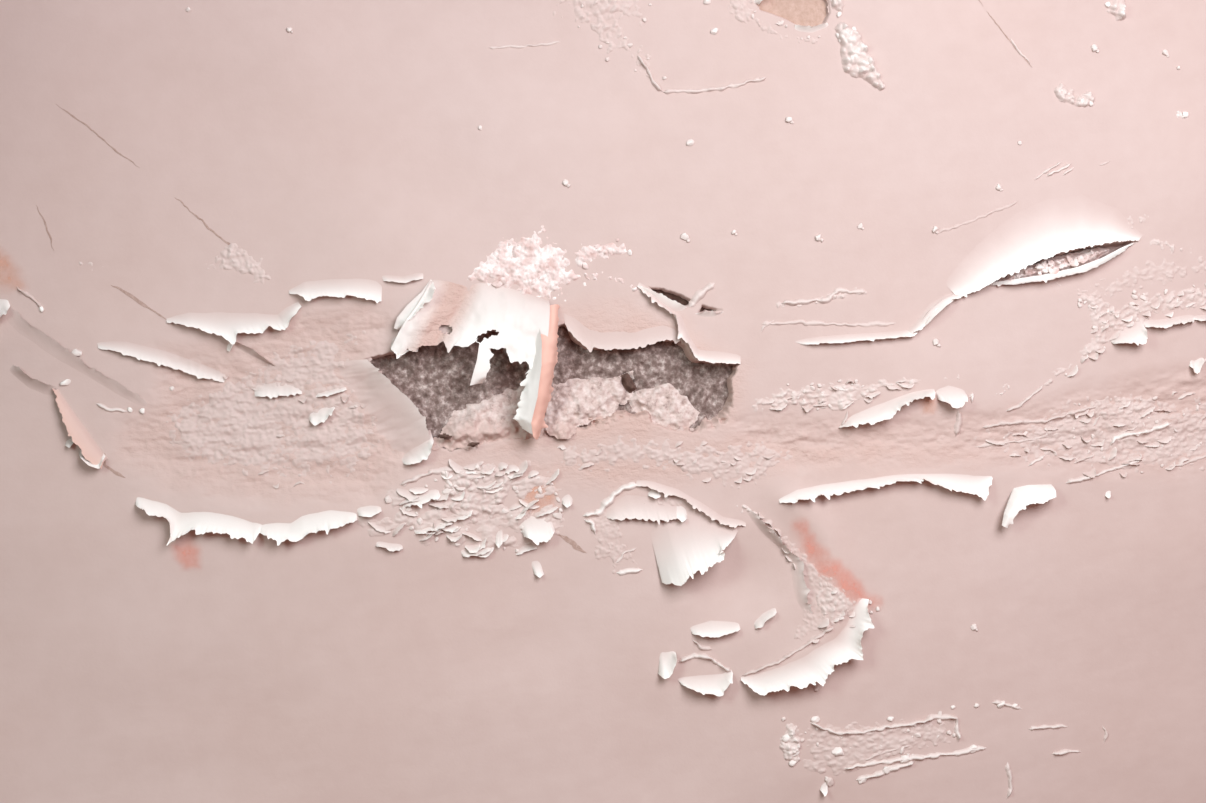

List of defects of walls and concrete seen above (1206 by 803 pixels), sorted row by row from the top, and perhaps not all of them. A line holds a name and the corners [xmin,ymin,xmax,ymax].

flaking render [727,0,885,91]
peeling [0,286,148,478]
flaking render [97,273,896,696]
peeling [779,474,993,503]